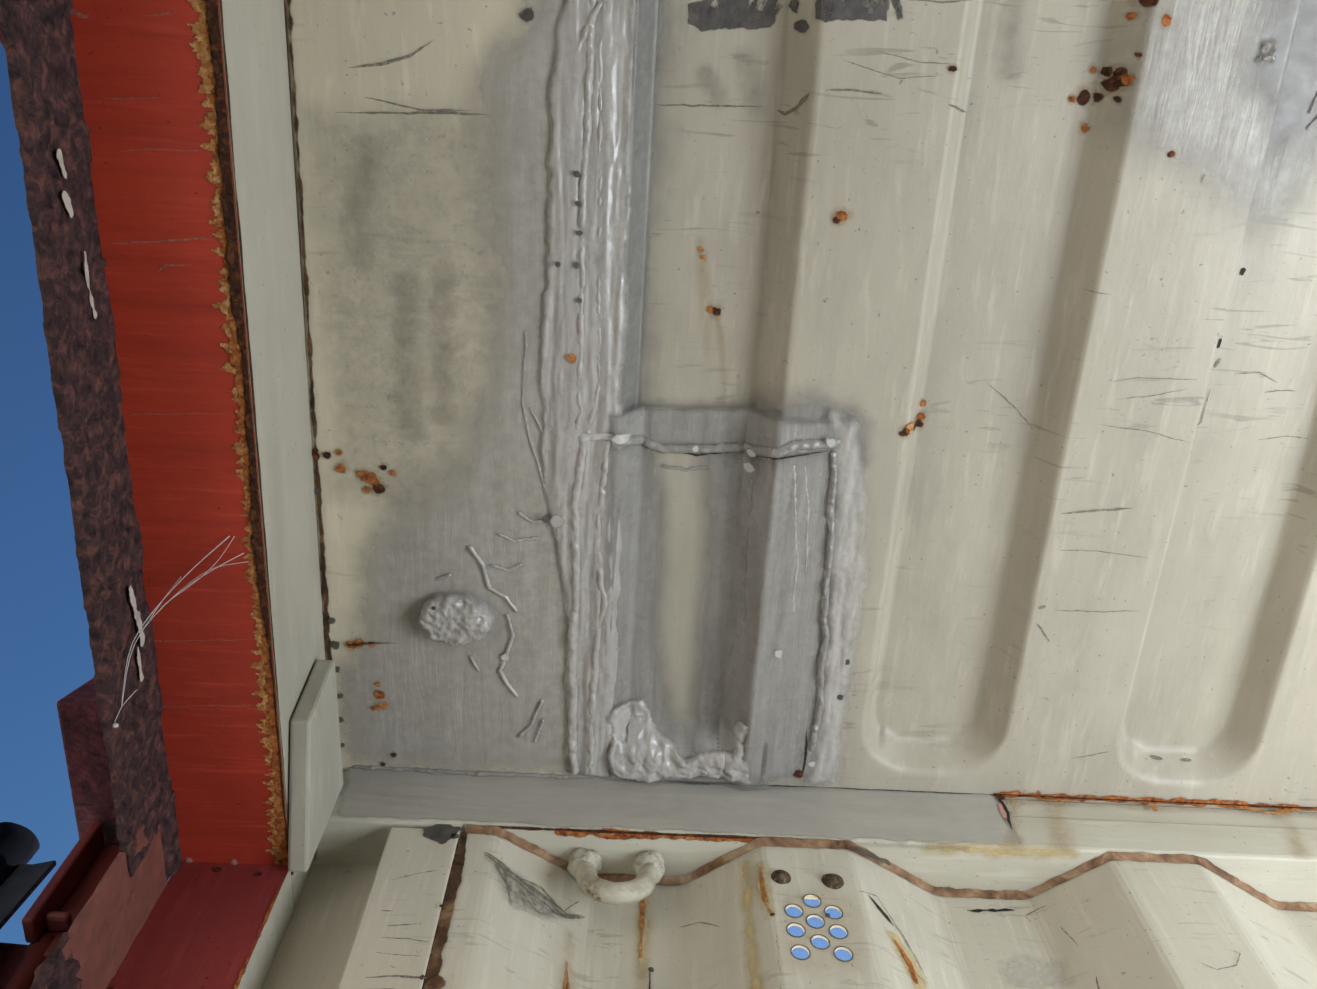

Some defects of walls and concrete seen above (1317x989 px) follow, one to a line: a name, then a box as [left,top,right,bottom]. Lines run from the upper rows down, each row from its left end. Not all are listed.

peeling [688,0,903,33]
corrosion [1125,0,1172,26]
damp [350,42,431,68]
corrosion [1069,67,1135,105]
damp [336,97,490,115]
corrosion [287,0,396,672]
corrosion [186,0,294,875]
corrosion [994,791,1317,815]
corrosion [420,824,760,989]
corrosion [861,891,925,988]